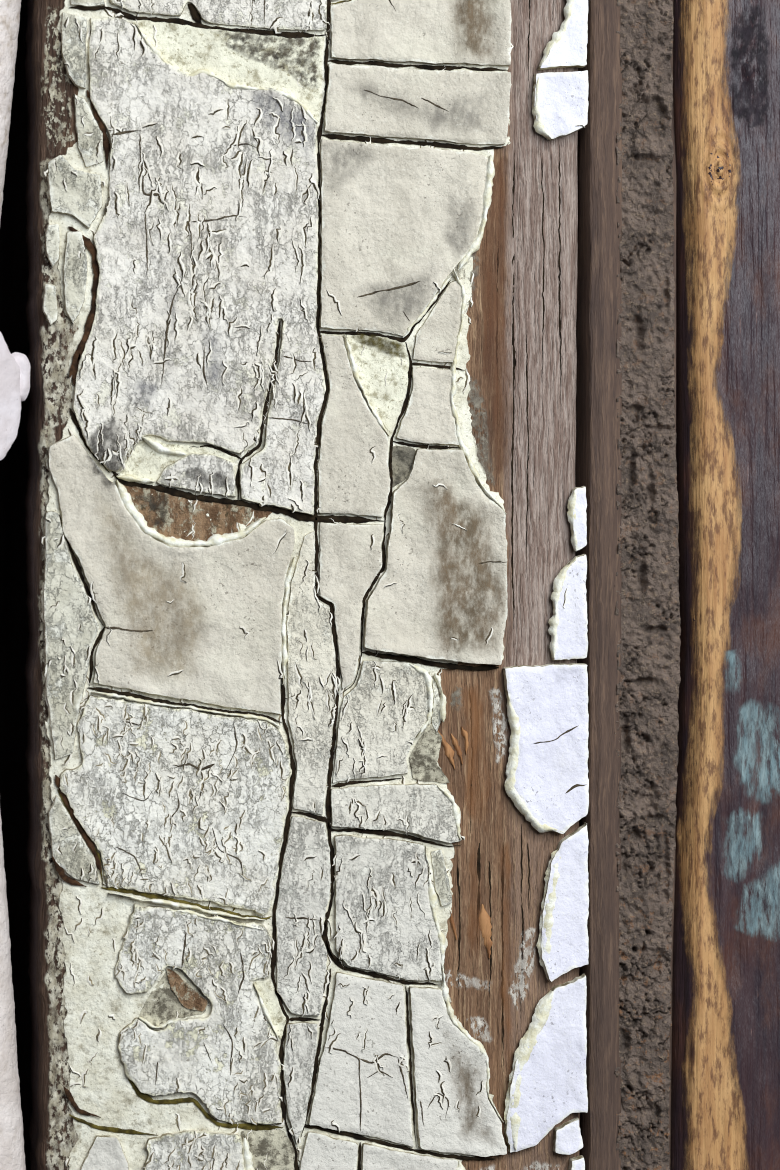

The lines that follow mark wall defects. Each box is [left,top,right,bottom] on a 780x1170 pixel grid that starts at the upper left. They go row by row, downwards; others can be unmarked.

crack [52,0,562,1170]
peeling [40,0,589,1170]